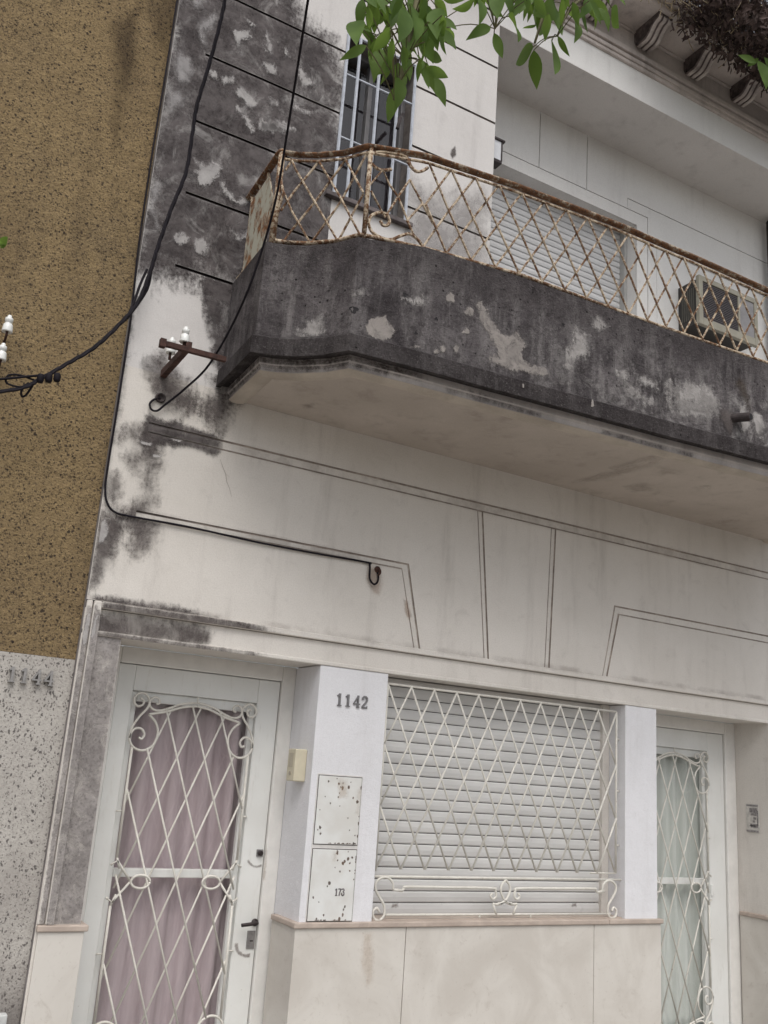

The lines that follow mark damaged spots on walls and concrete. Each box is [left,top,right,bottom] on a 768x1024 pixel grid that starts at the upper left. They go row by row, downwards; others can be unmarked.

damp [119,0,418,486]
spalling [366,315,395,341]
spalling [464,301,550,376]
spalling [616,369,720,418]
damp [41,474,264,925]